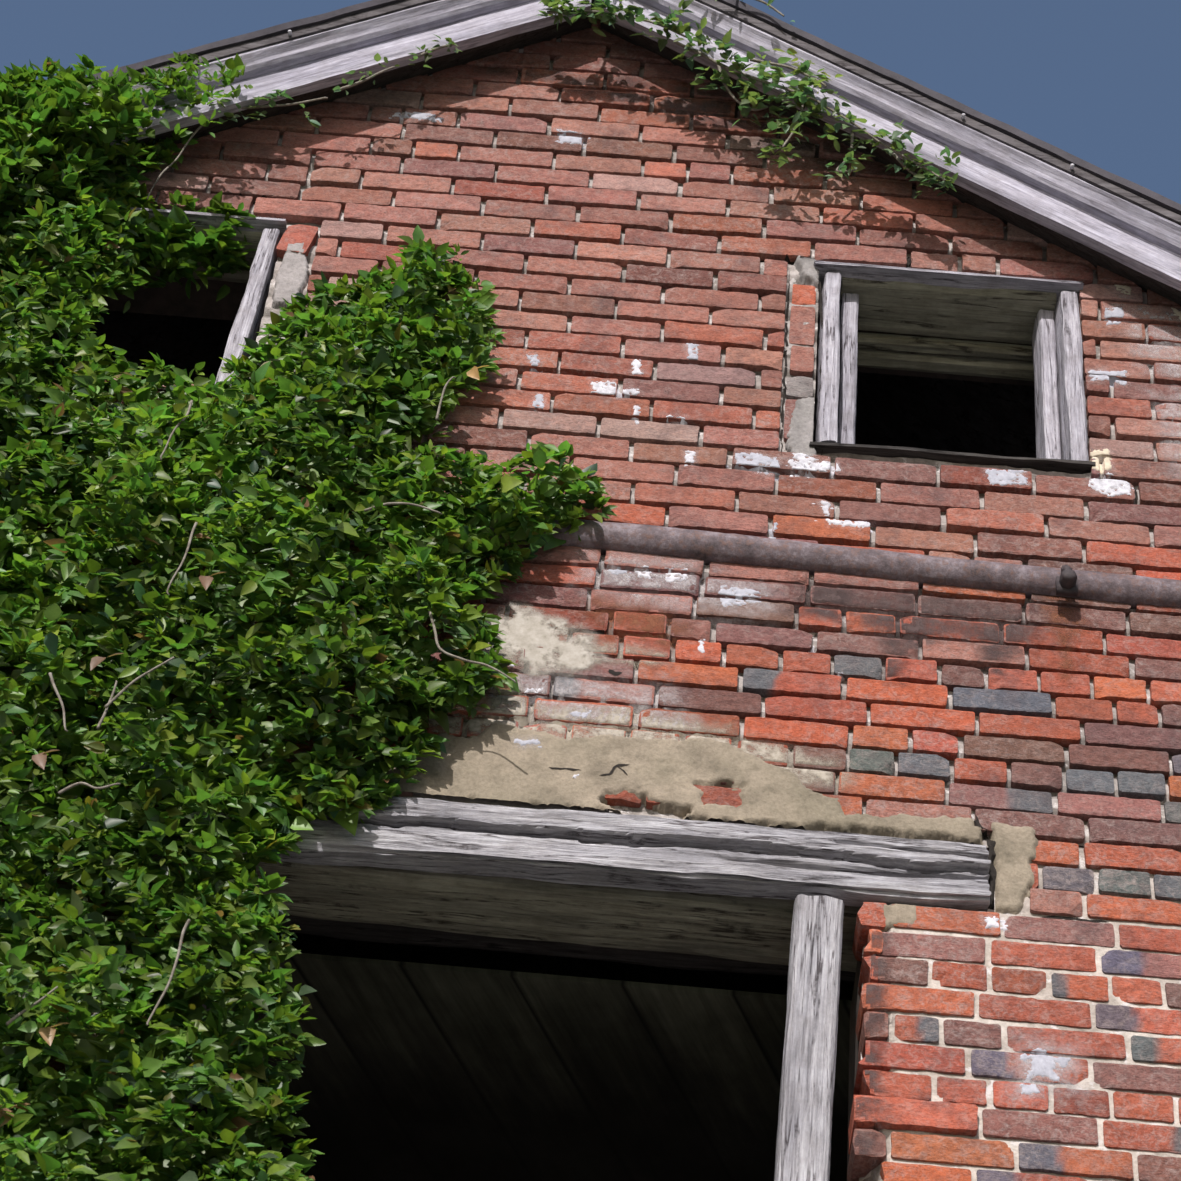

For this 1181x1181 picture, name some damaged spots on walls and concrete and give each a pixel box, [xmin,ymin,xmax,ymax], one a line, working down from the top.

peeling [514,738,542,748]